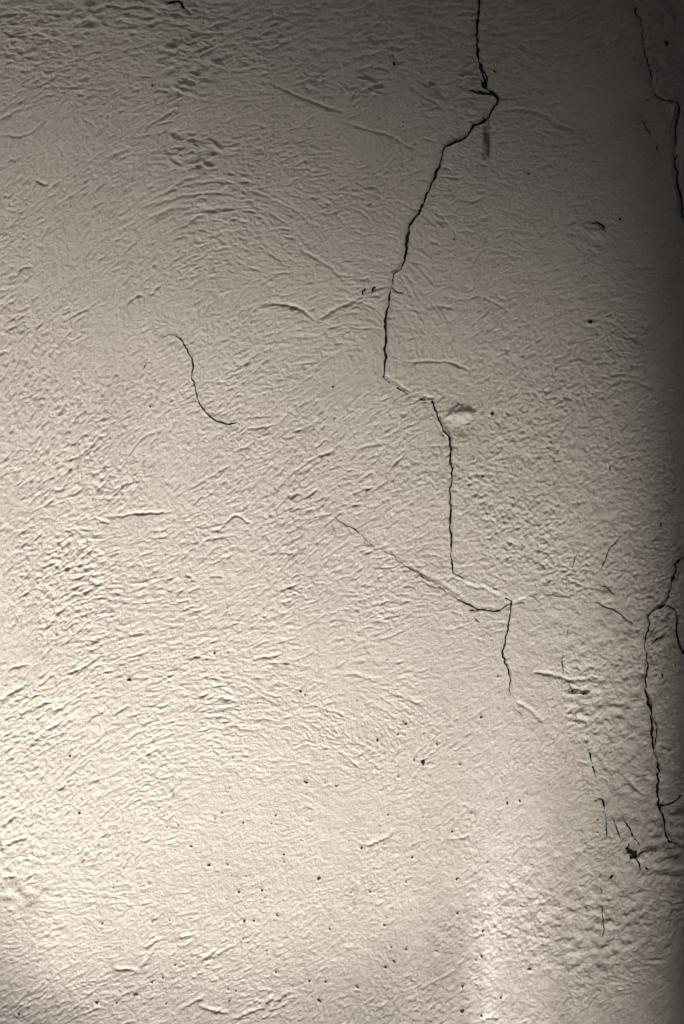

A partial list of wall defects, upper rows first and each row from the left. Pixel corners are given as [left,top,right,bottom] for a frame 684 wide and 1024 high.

crack [160,334,240,425]
crack [332,0,684,849]